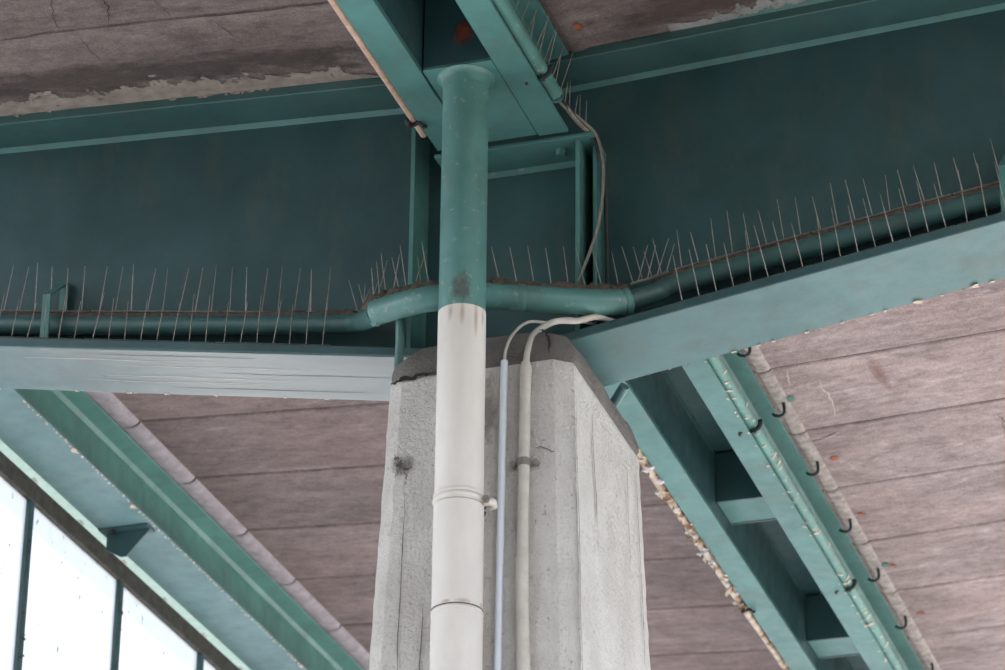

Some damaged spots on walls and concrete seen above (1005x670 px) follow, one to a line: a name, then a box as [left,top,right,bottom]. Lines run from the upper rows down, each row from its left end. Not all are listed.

crack [0,0,329,60]
water stain [629,0,755,26]
peeling [667,0,832,32]
water stain [0,49,349,98]
peeling [0,65,380,117]